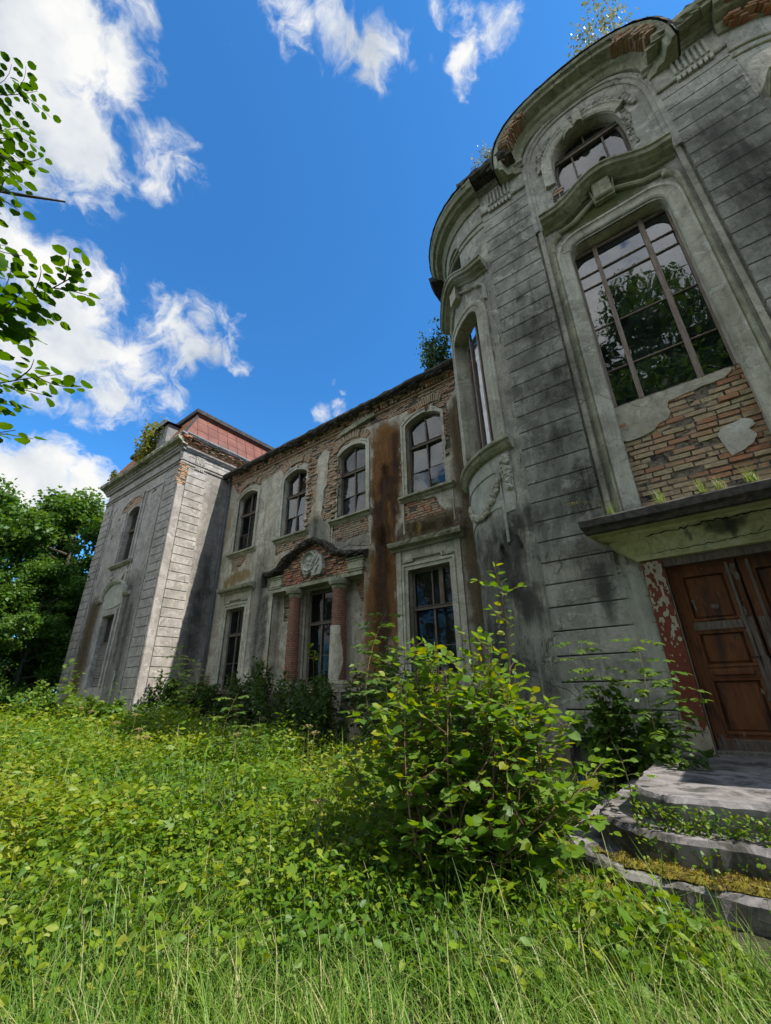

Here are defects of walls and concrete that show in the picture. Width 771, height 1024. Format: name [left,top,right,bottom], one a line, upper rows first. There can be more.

flaking render [232,378,455,622]
rust [362,422,402,688]
peeling [641,561,685,687]
flaking render [614,363,771,507]
peeling [683,705,746,754]